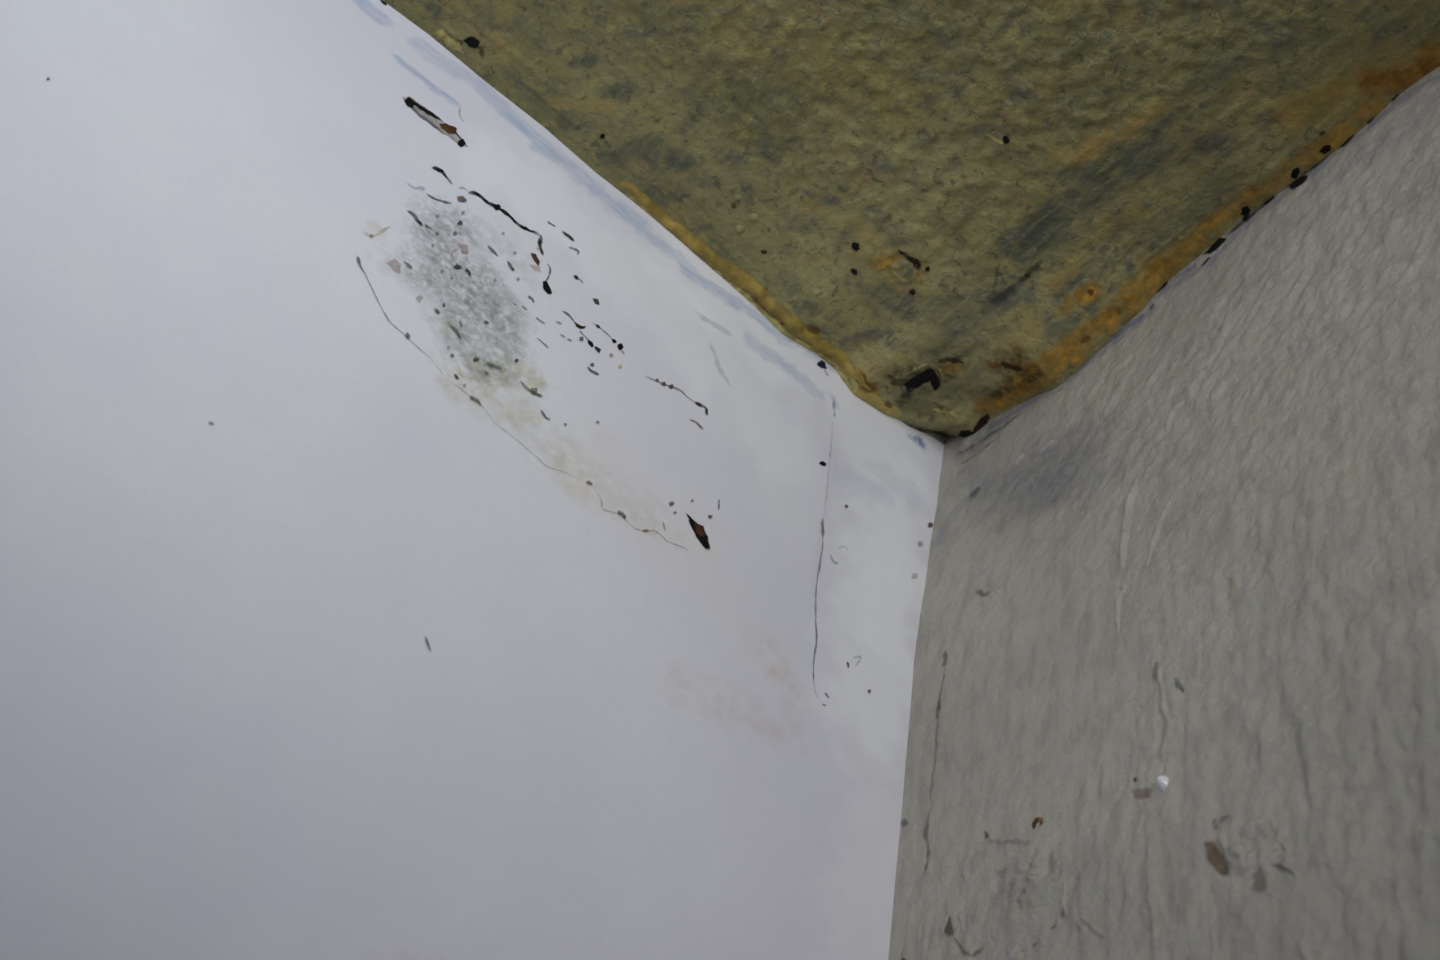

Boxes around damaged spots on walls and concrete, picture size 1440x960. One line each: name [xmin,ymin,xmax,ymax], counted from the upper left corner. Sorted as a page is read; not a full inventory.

crack [813,625,829,706]